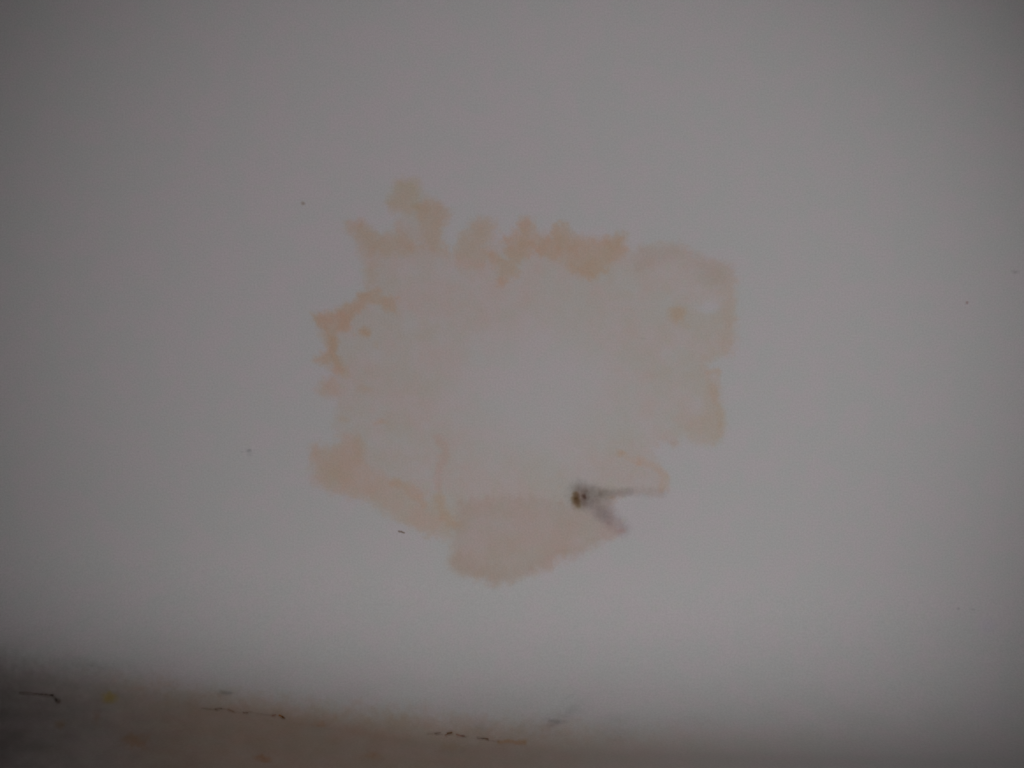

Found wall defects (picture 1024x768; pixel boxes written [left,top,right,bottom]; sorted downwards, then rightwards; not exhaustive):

damp [301,170,746,593]